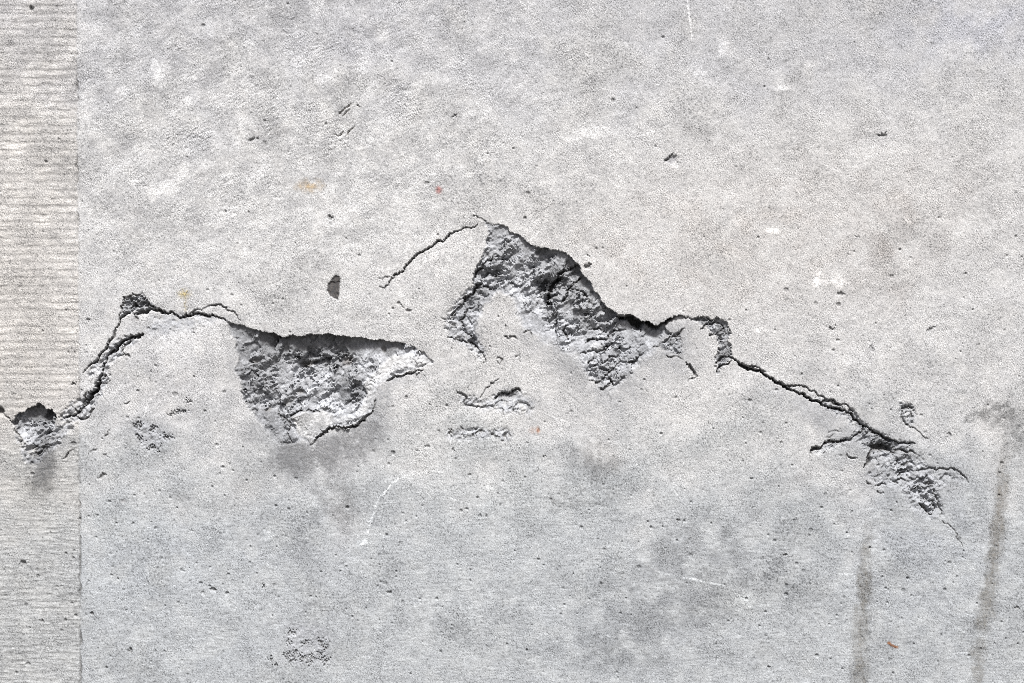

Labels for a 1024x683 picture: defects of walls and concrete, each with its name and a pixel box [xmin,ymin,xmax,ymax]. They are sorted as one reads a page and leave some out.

crack [378,215,487,289]
spalling [0,403,58,456]
crack [59,304,242,422]
spalling [224,320,434,449]
spalling [441,222,735,399]
crack [732,357,916,455]
spalling [846,431,970,547]